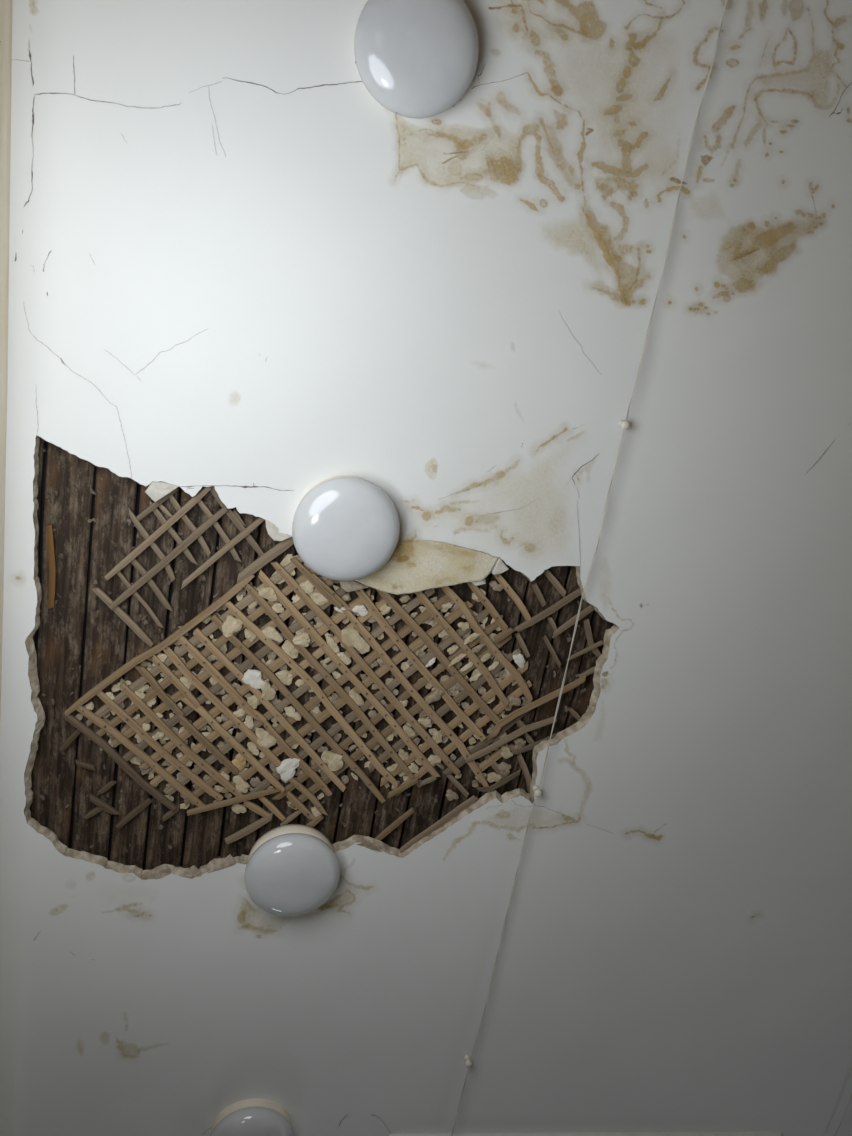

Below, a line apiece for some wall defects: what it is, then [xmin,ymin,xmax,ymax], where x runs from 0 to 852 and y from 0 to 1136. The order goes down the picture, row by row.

water stain [557,0,668,114]
water stain [498,121,564,210]
water stain [578,115,648,230]
water stain [657,156,711,202]
crack [15,25,363,478]
water stain [586,212,645,305]
water stain [361,540,477,592]
spalling [24,435,620,880]